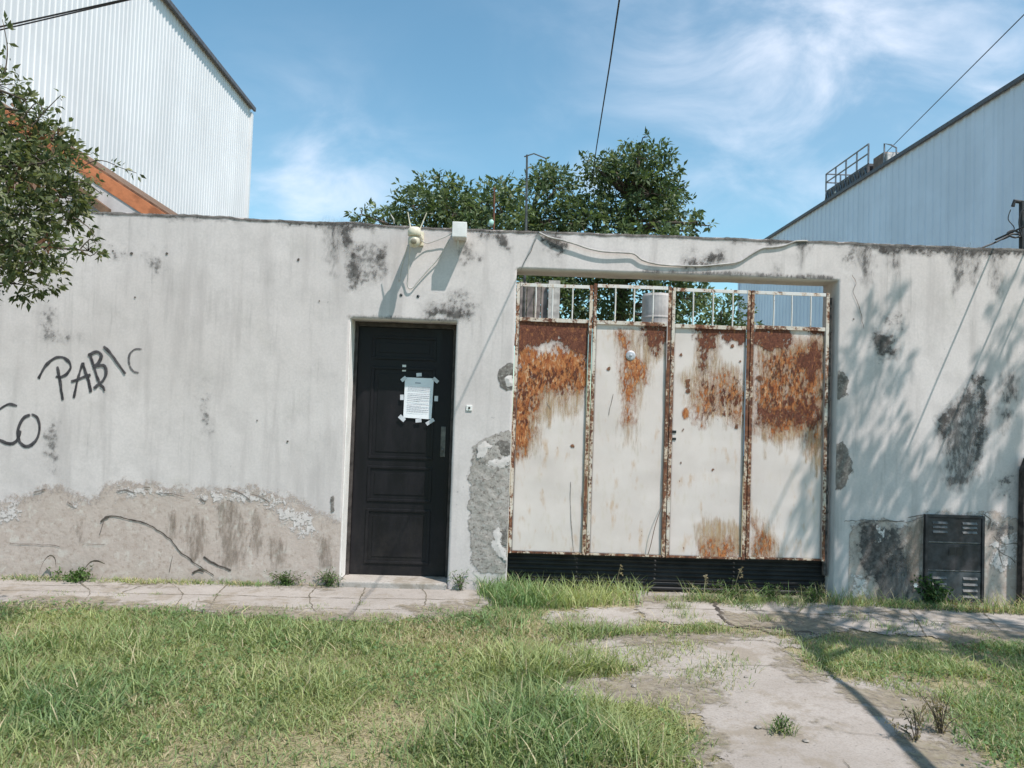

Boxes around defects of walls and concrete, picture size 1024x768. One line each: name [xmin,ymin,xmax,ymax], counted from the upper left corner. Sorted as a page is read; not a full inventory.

water stain [67,210,452,289]
water stain [467,229,1024,283]
corrosion [515,321,588,458]
corrosion [607,326,667,424]
corrosion [682,328,824,477]
water stain [874,329,903,356]
water stain [938,374,989,486]
crack [91,515,231,576]
peeling [0,480,341,586]
flaking render [467,430,511,575]
peeling [848,511,952,602]
peeling [946,511,1018,605]